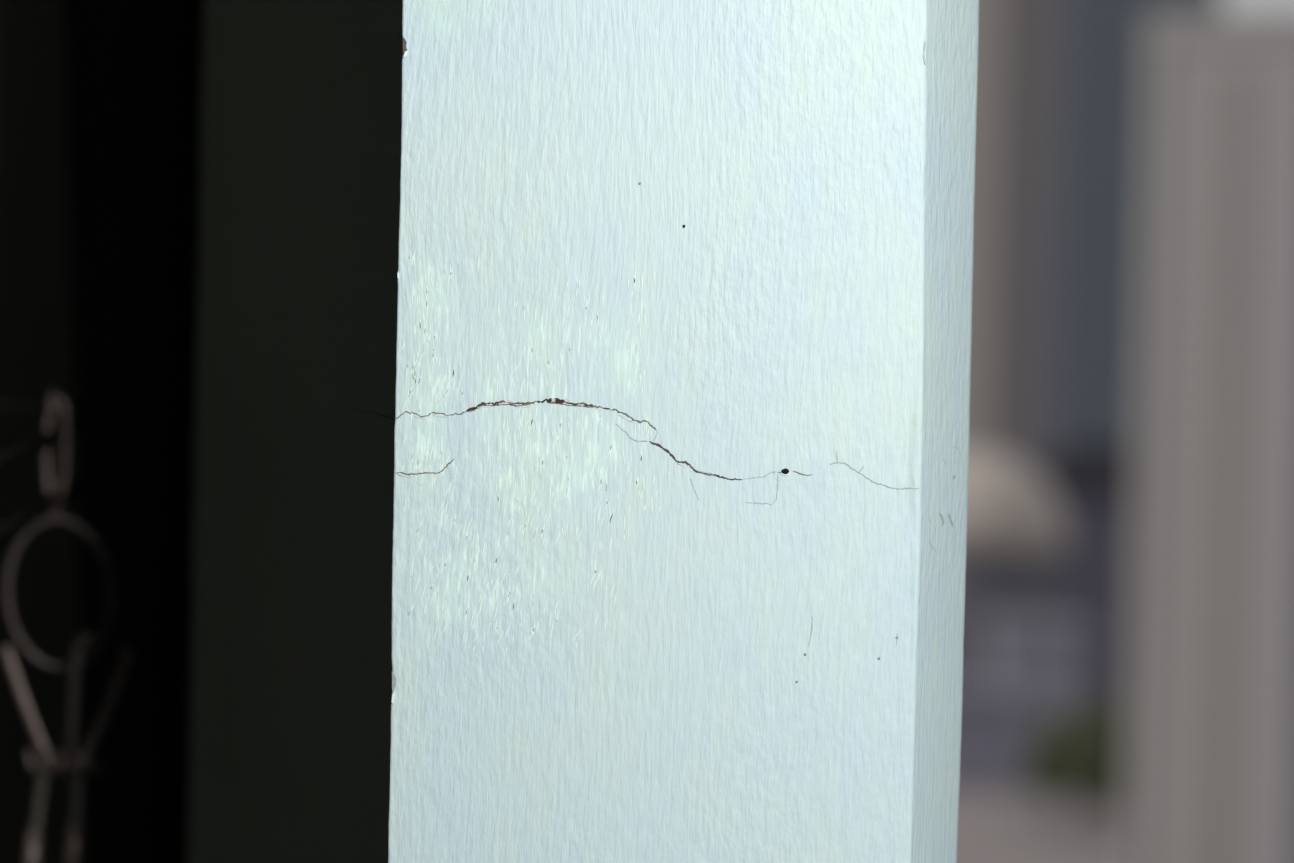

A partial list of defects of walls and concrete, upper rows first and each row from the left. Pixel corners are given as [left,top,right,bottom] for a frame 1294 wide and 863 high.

crack [350,398,919,505]